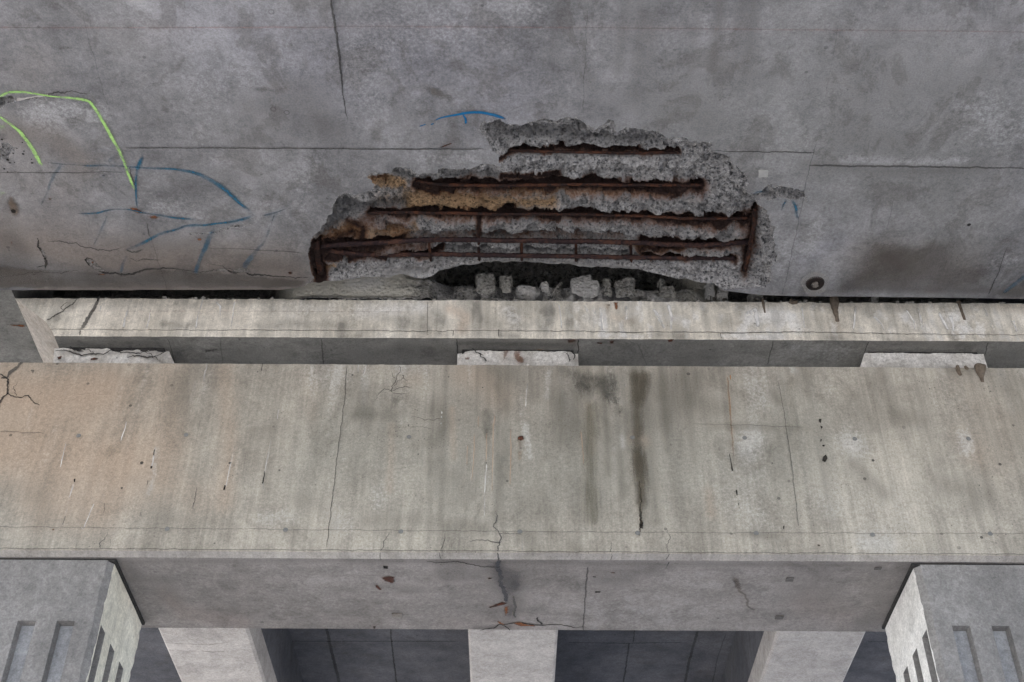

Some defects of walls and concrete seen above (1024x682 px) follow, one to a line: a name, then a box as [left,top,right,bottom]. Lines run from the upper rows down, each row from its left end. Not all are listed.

spalling [307,116,808,302]
crack [0,362,39,405]
crack [37,224,308,360]
crack [219,329,660,361]
leakage [632,373,648,508]
crack [691,330,1024,338]
crack [427,514,587,631]